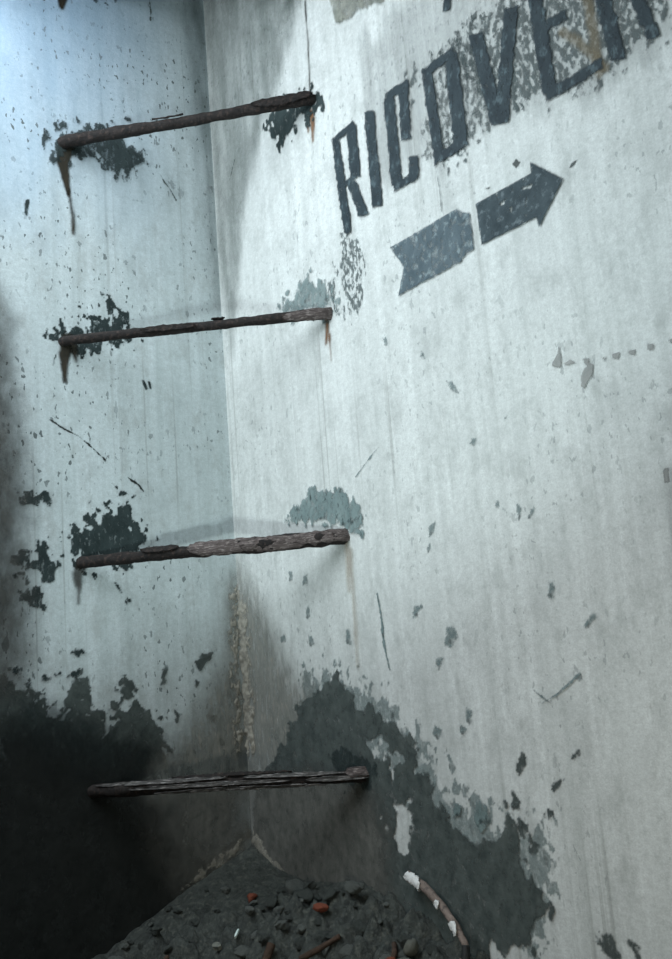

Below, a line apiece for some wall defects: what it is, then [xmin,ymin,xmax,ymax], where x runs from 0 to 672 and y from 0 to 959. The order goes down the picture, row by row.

spalling [330,0,384,23]
peeling [42,116,149,180]
rust [57,147,75,234]
rust [59,333,77,382]
peeling [286,485,364,539]
peeling [15,486,158,611]
rust [73,566,85,596]
peeling [445,627,457,647]
peeling [195,652,213,687]
peeling [0,649,173,772]
water stain [0,581,387,959]
peeling [265,661,560,959]